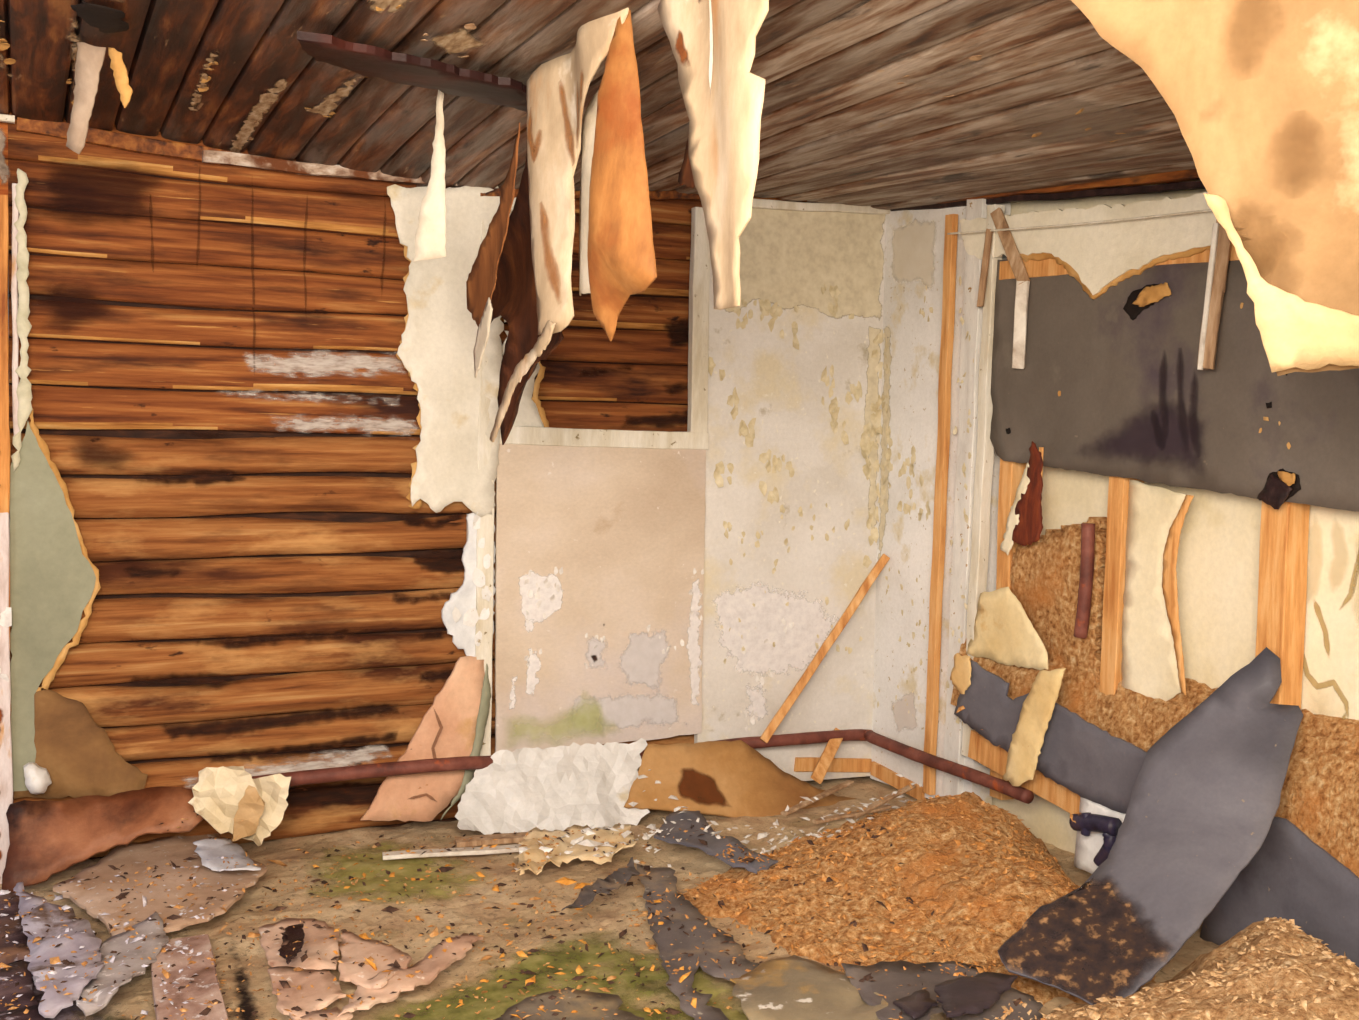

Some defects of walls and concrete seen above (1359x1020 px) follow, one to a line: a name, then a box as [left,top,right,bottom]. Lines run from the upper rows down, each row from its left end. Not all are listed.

peeling [370,0,407,13]
peeling [421,23,484,58]
peeling [188,51,218,111]
peeling [229,79,288,153]
peeling [305,77,362,117]
spalling [1020,245,1211,299]
peeling [716,208,935,647]
damp [1098,354,1201,466]
peeling [572,357,863,732]
peeling [441,512,496,657]
peeling [519,567,563,632]
peeling [509,648,542,709]